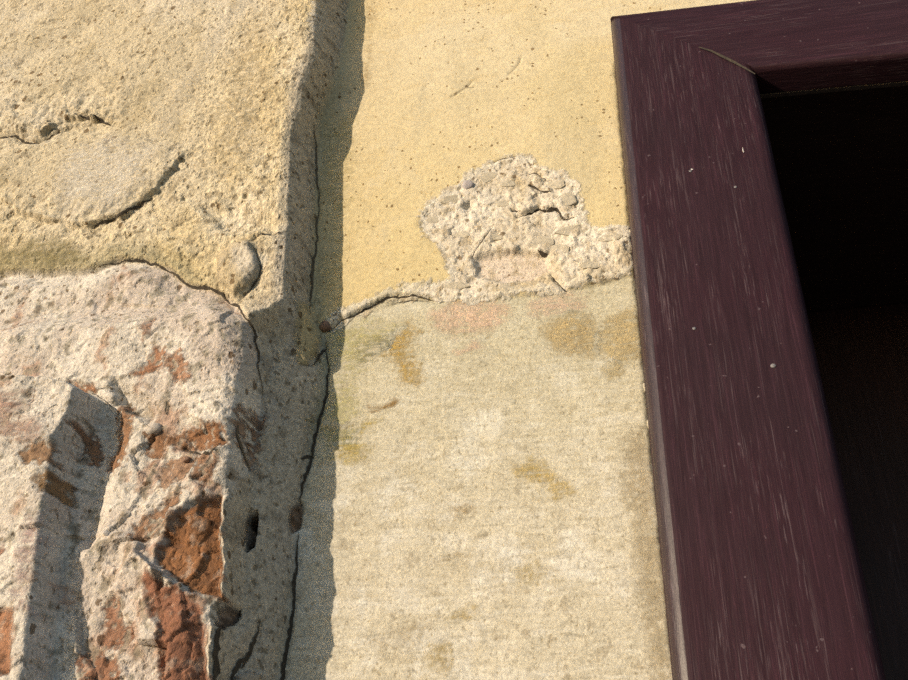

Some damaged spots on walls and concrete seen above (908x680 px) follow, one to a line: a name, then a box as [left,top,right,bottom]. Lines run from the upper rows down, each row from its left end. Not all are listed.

crack [0,113,114,144]
peeling [133,346,191,383]
damp [389,328,420,383]
damp [534,294,642,379]
peeling [65,406,136,471]
flaking render [277,153,672,680]
peeling [19,441,78,507]
peeling [127,406,266,680]
peeling [0,609,14,676]
peeling [75,598,134,680]